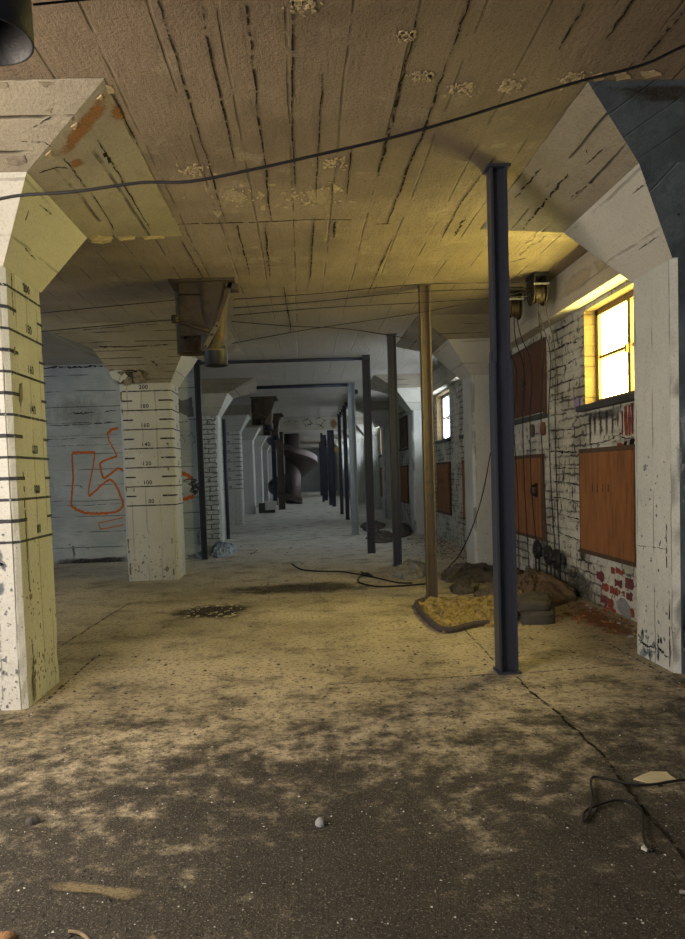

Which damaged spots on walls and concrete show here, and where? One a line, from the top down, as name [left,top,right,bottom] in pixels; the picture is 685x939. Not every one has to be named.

peeling [282,0,323,17]
crack [606,0,633,38]
crack [21,117,114,230]
corrosion [66,101,124,167]
crack [97,140,150,229]
crack [157,0,351,331]
crack [368,0,470,292]
crack [441,159,493,240]
crack [513,149,603,262]
crack [548,321,634,540]
crack [329,630,494,685]
crack [517,603,685,861]